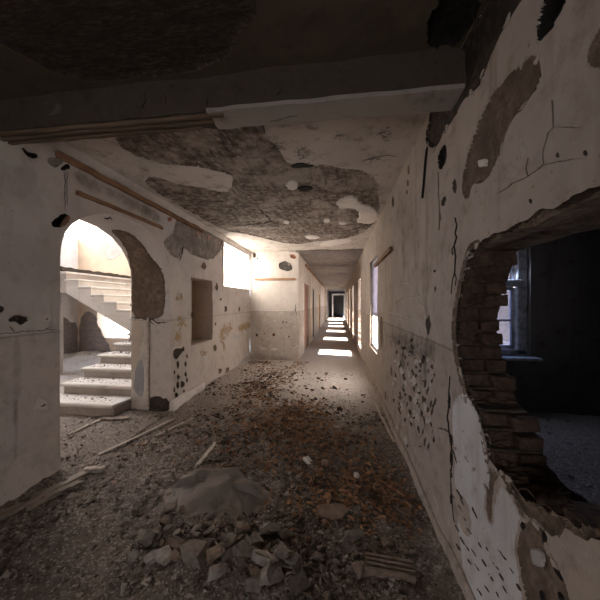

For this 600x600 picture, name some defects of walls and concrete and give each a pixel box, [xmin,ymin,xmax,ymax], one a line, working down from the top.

flaking render [115,126,380,244]
crack [438,172,457,294]
flaking render [425,0,522,170]
flaking render [452,54,541,199]
crack [496,100,586,194]
flaking render [63,311,111,354]
flaking render [112,230,166,396]
flaking render [149,316,188,412]
flaking render [385,338,437,450]
crack [438,376,457,522]
spalling [449,239,600,600]